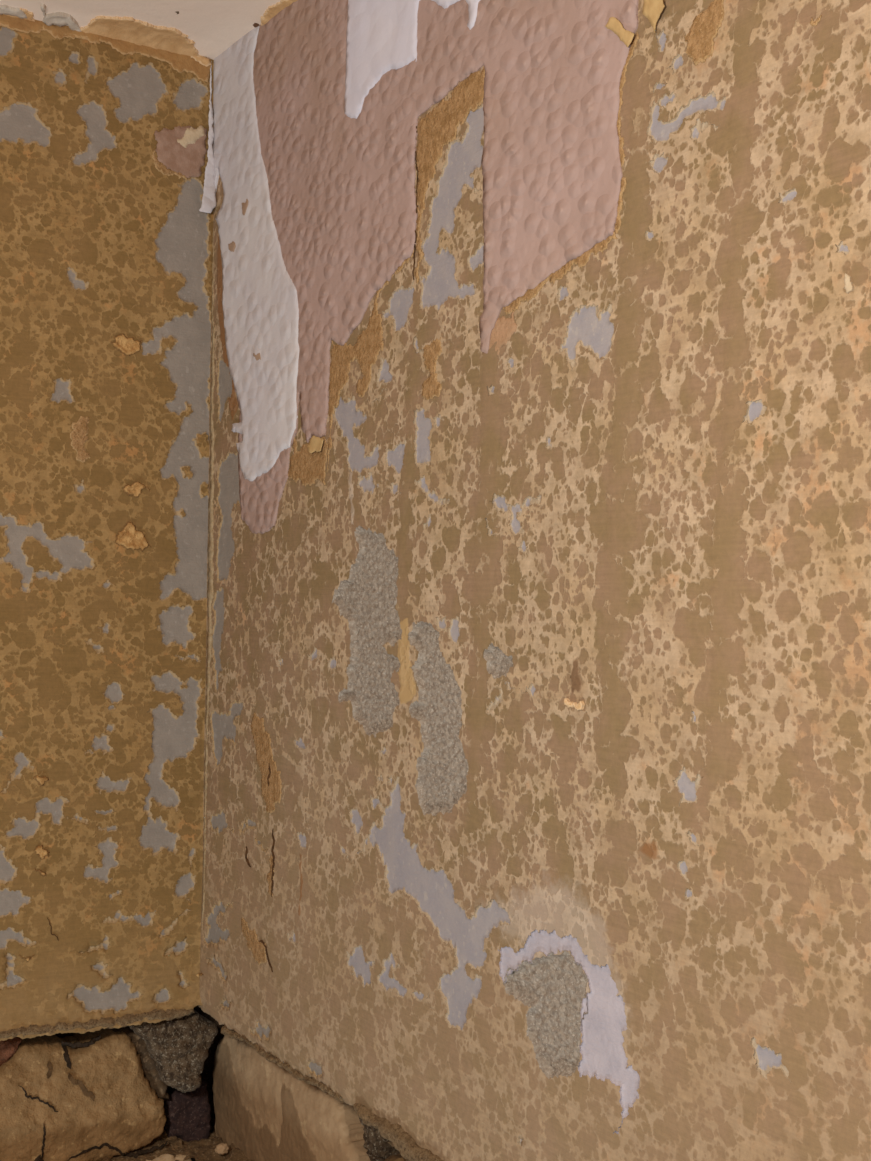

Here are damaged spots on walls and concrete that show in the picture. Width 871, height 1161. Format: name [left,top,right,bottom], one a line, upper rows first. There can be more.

peeling [0,26,18,57]
peeling [646,29,726,174]
peeling [382,104,484,354]
peeling [557,286,614,369]
peeling [333,357,450,530]
peeling [485,493,541,553]
peeling [0,177,243,1066]
flaking render [306,526,469,816]
flaking render [483,643,536,713]
flaking render [340,773,640,1136]
flaking render [221,1026,444,1161]